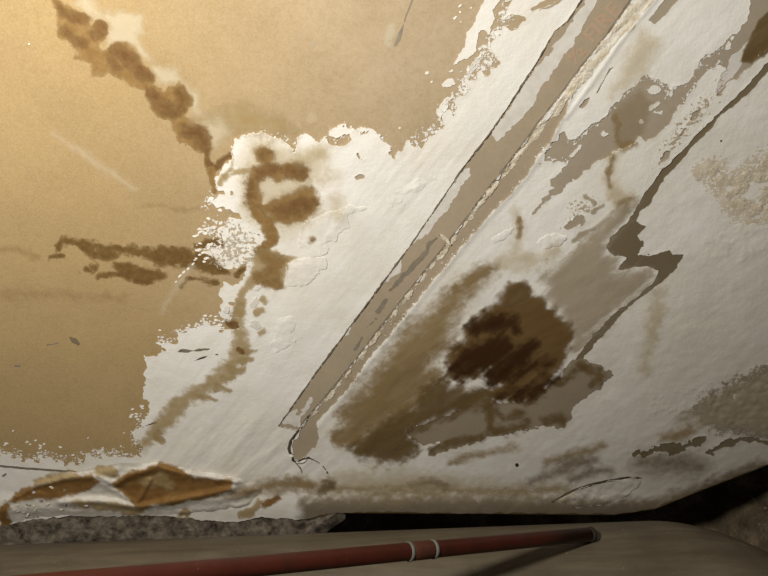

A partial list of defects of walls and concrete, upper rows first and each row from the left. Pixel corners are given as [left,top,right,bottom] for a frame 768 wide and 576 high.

water stain [49,0,319,448]
peeling [0,0,561,466]
crack [278,0,631,474]
water stain [332,266,604,463]
peeling [280,0,768,460]